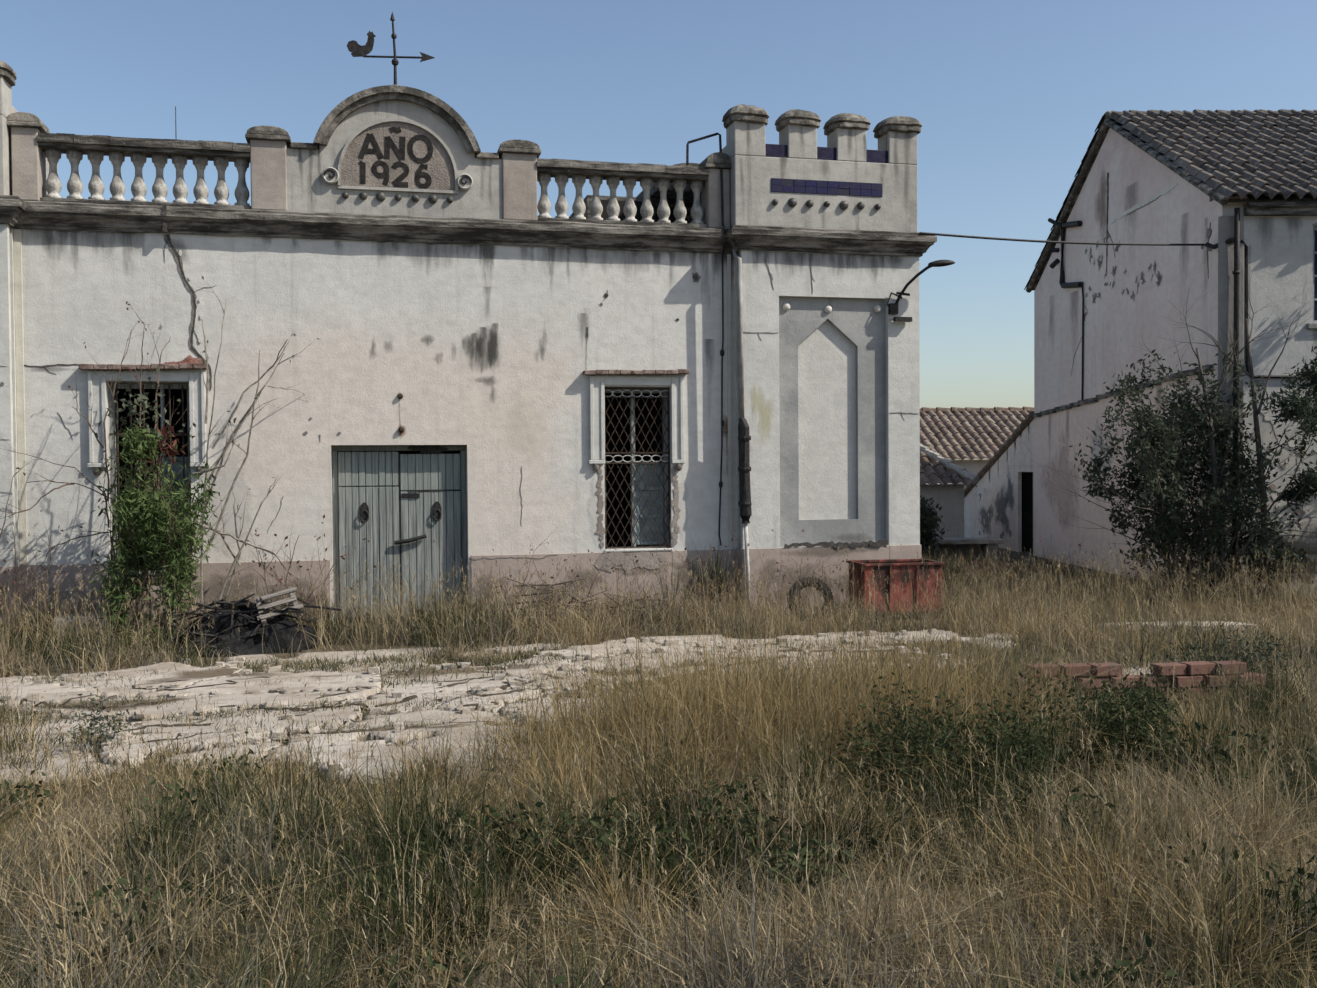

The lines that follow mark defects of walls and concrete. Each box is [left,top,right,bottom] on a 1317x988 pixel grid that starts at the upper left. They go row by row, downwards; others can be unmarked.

damp [468,323,498,395]
crack [0,646,966,742]